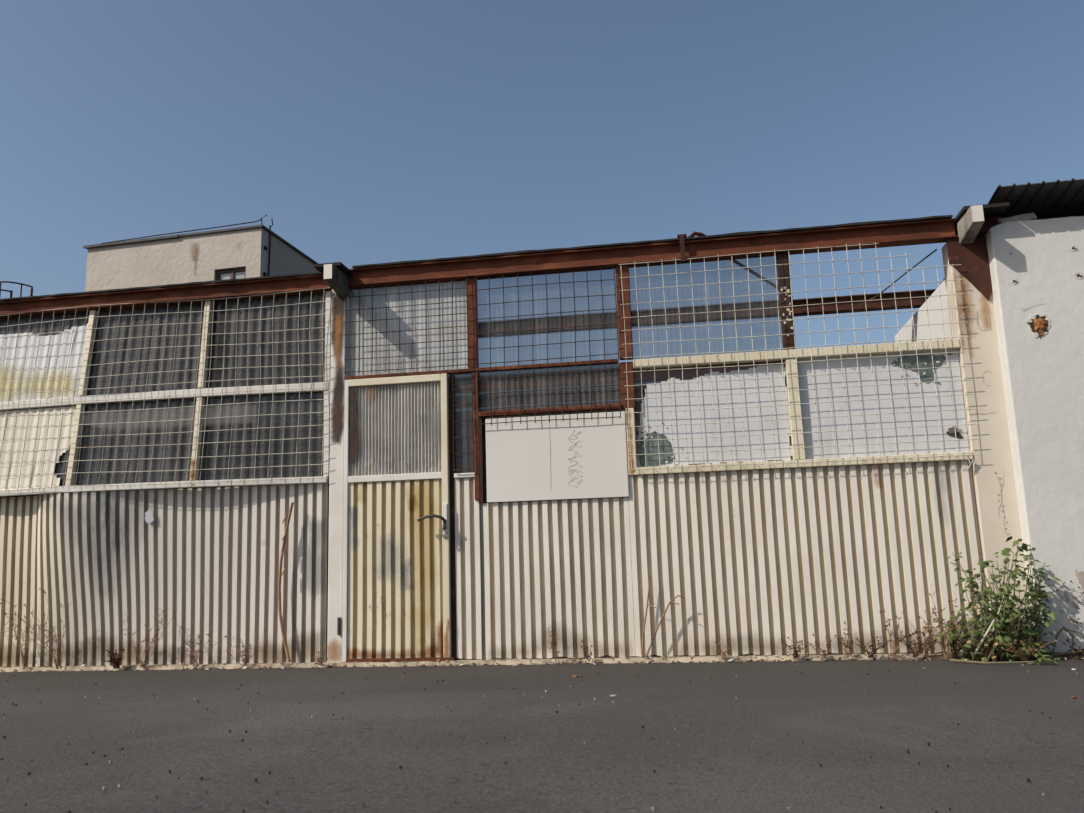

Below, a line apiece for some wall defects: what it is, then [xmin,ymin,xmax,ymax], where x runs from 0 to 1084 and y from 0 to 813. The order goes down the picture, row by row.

corrosion [961,277,991,330]
spalling [1026,315,1048,338]
peeling [1056,569,1084,635]